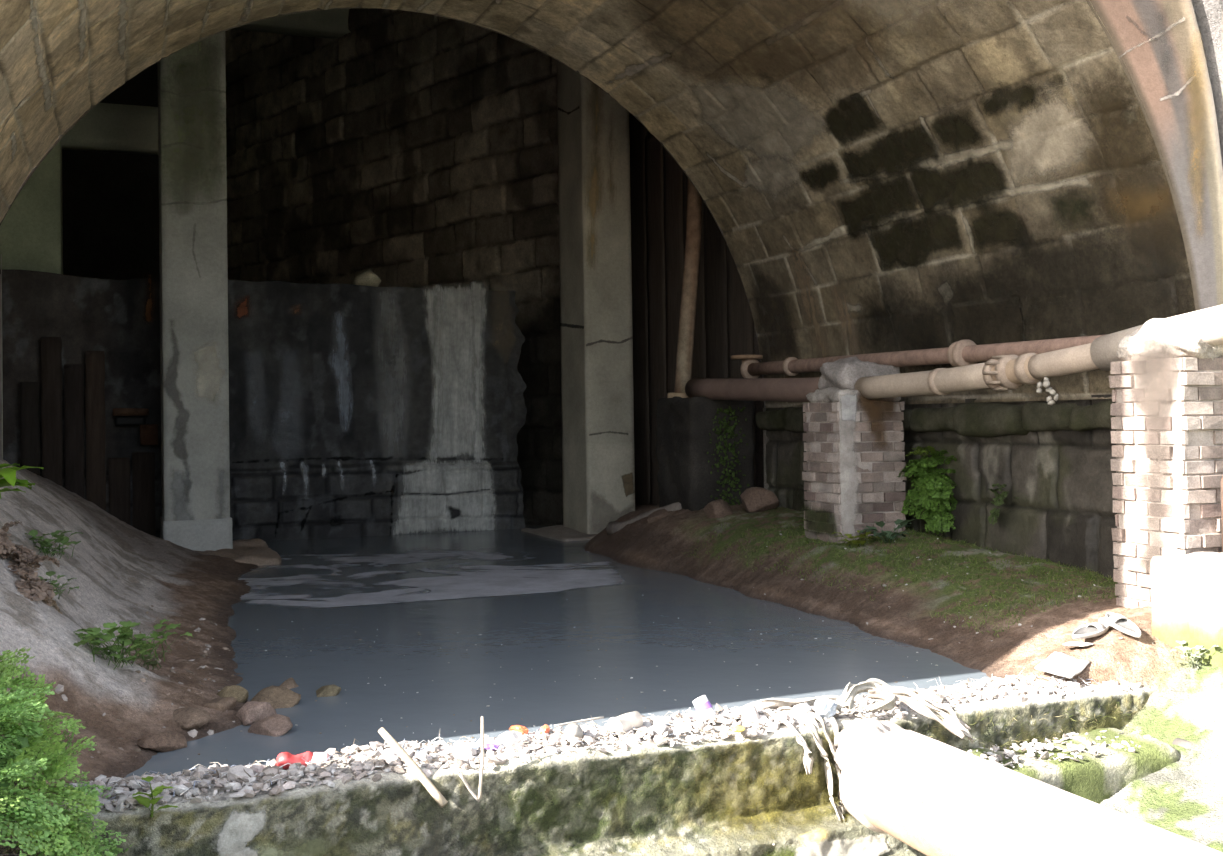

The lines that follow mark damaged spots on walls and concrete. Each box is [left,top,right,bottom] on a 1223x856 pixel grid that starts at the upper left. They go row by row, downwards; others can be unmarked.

leakage [832,76,1196,355]
leakage [752,224,848,362]
leakage [330,313,352,430]
leakage [377,282,495,535]
leakage [839,392,857,534]
leakage [1130,339,1184,569]
peeling [217,811,326,856]